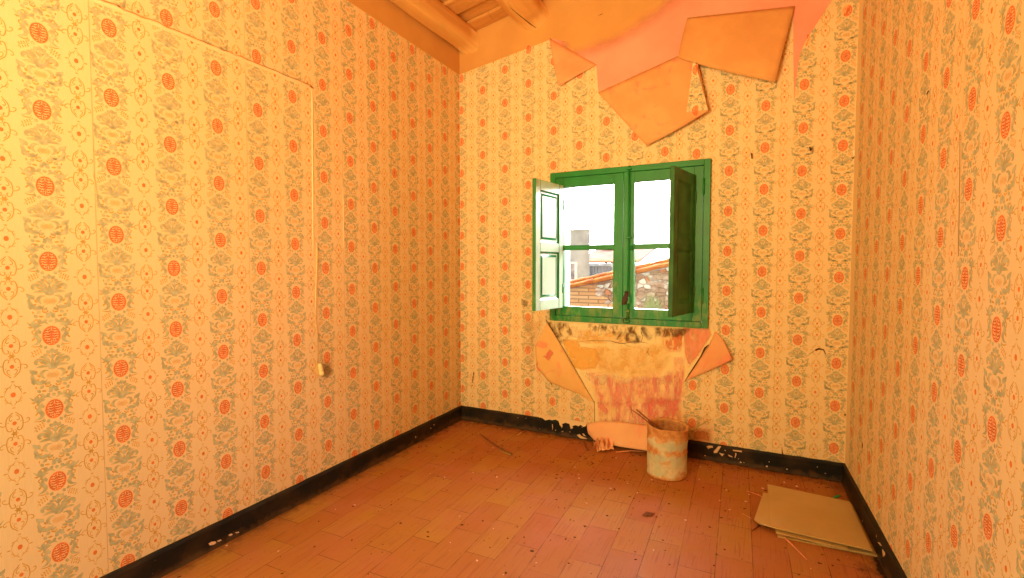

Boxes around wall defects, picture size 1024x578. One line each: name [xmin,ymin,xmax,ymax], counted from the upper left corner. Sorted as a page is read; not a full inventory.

peeling [549,0,859,146]
leakage [549,323,710,423]
peeling [535,320,732,451]